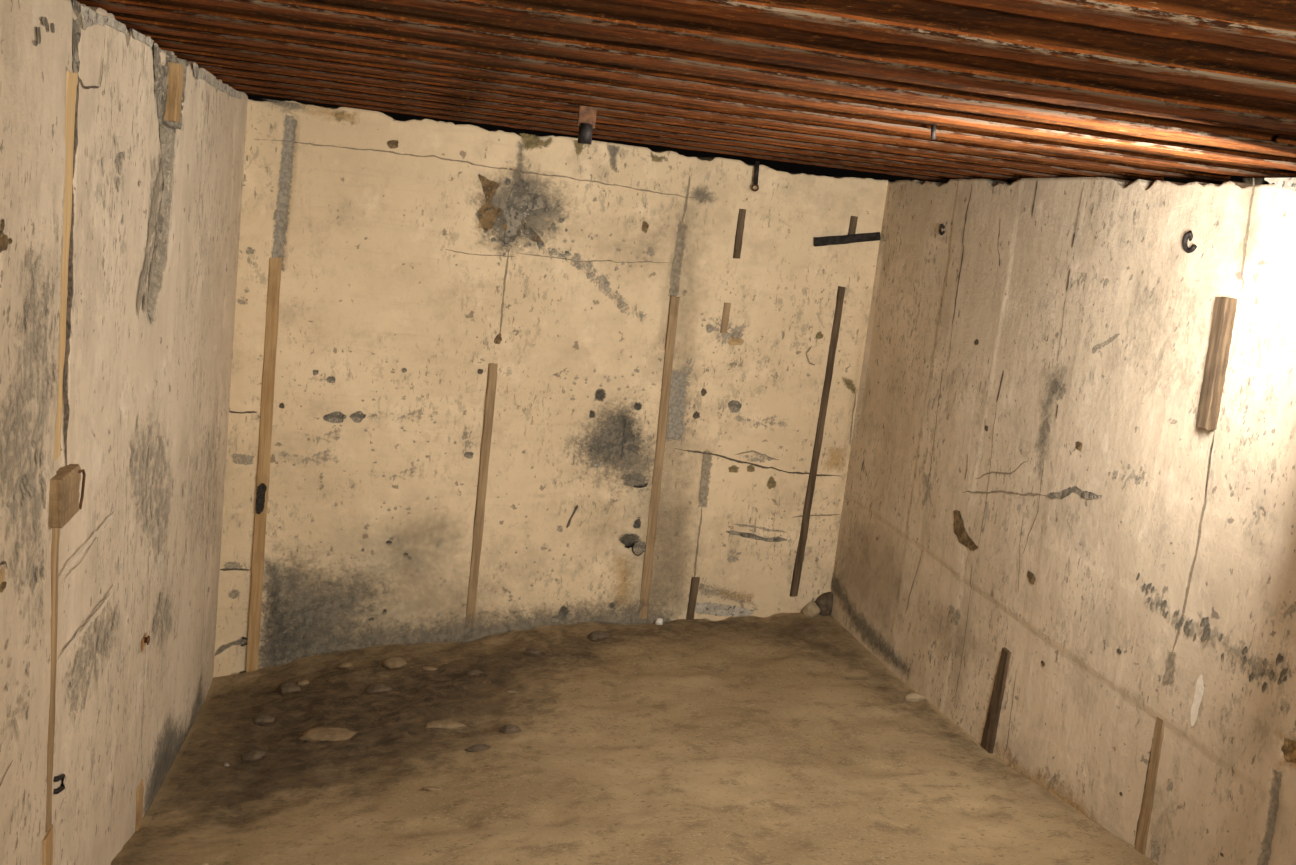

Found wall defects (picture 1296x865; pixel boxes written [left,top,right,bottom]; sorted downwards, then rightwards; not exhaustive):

spalling [81,6,244,323]
spalling [0,219,13,252]
peeling [233,454,254,465]
mould [555,356,650,486]
leakage [214,565,672,667]